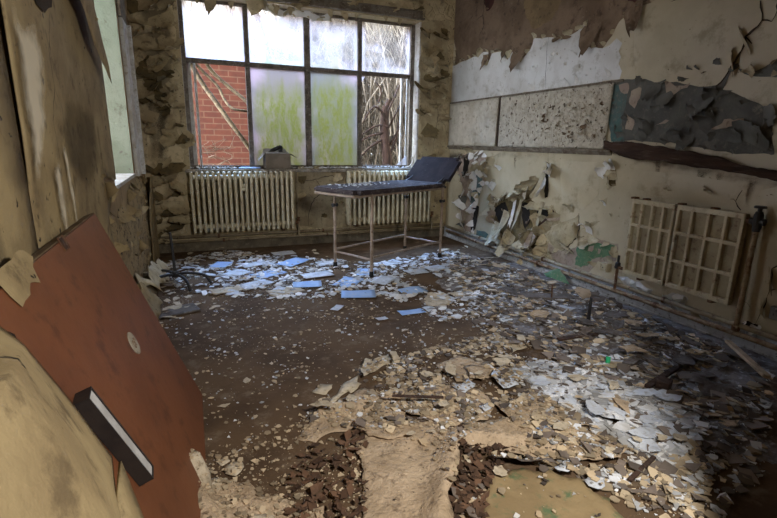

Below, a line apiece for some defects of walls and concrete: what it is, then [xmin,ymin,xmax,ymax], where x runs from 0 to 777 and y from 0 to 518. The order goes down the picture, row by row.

peeling [195,0,216,15]
peeling [245,0,426,25]
crack [716,0,777,86]
peeling [295,165,346,228]